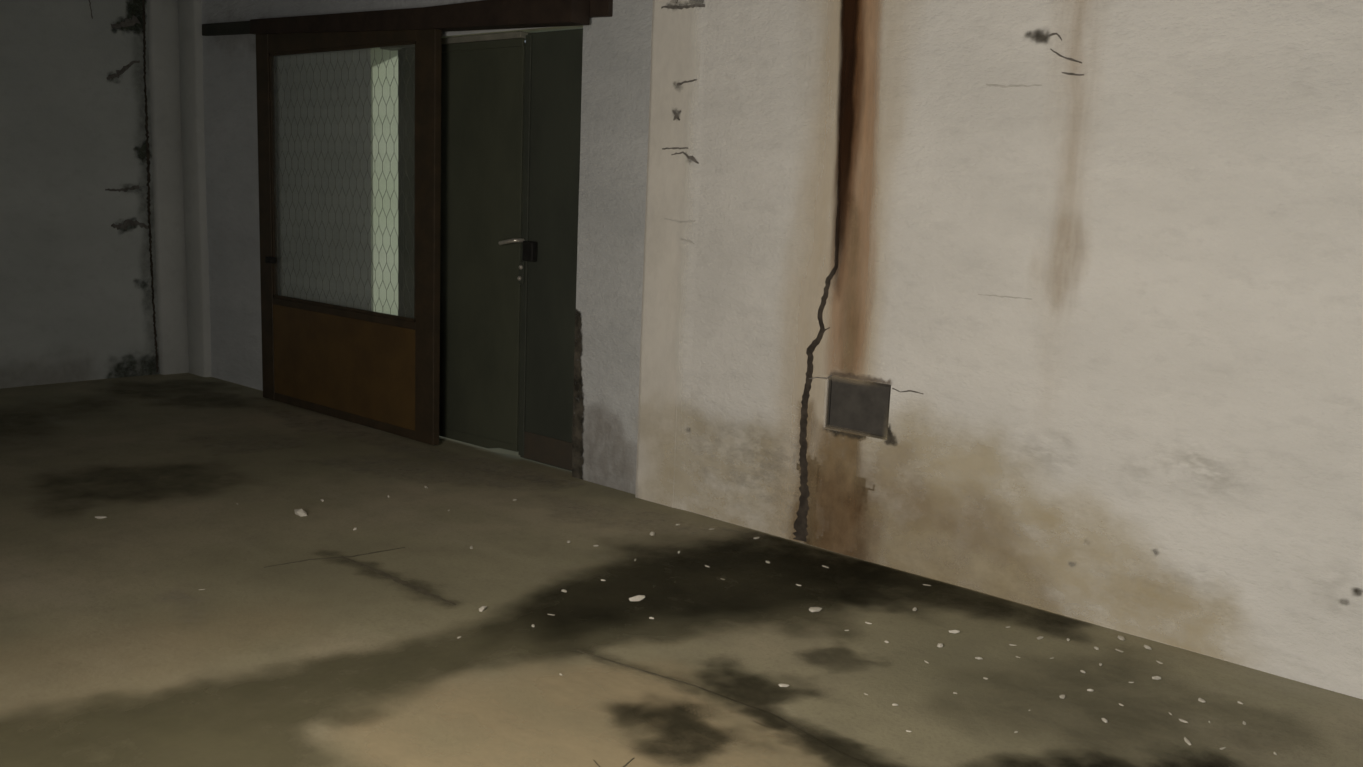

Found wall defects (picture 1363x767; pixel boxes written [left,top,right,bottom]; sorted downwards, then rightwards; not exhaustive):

leakage [0,438,1220,767]
crack [791,189,839,542]
corrosion [811,431,861,557]
corrosion [831,0,878,378]